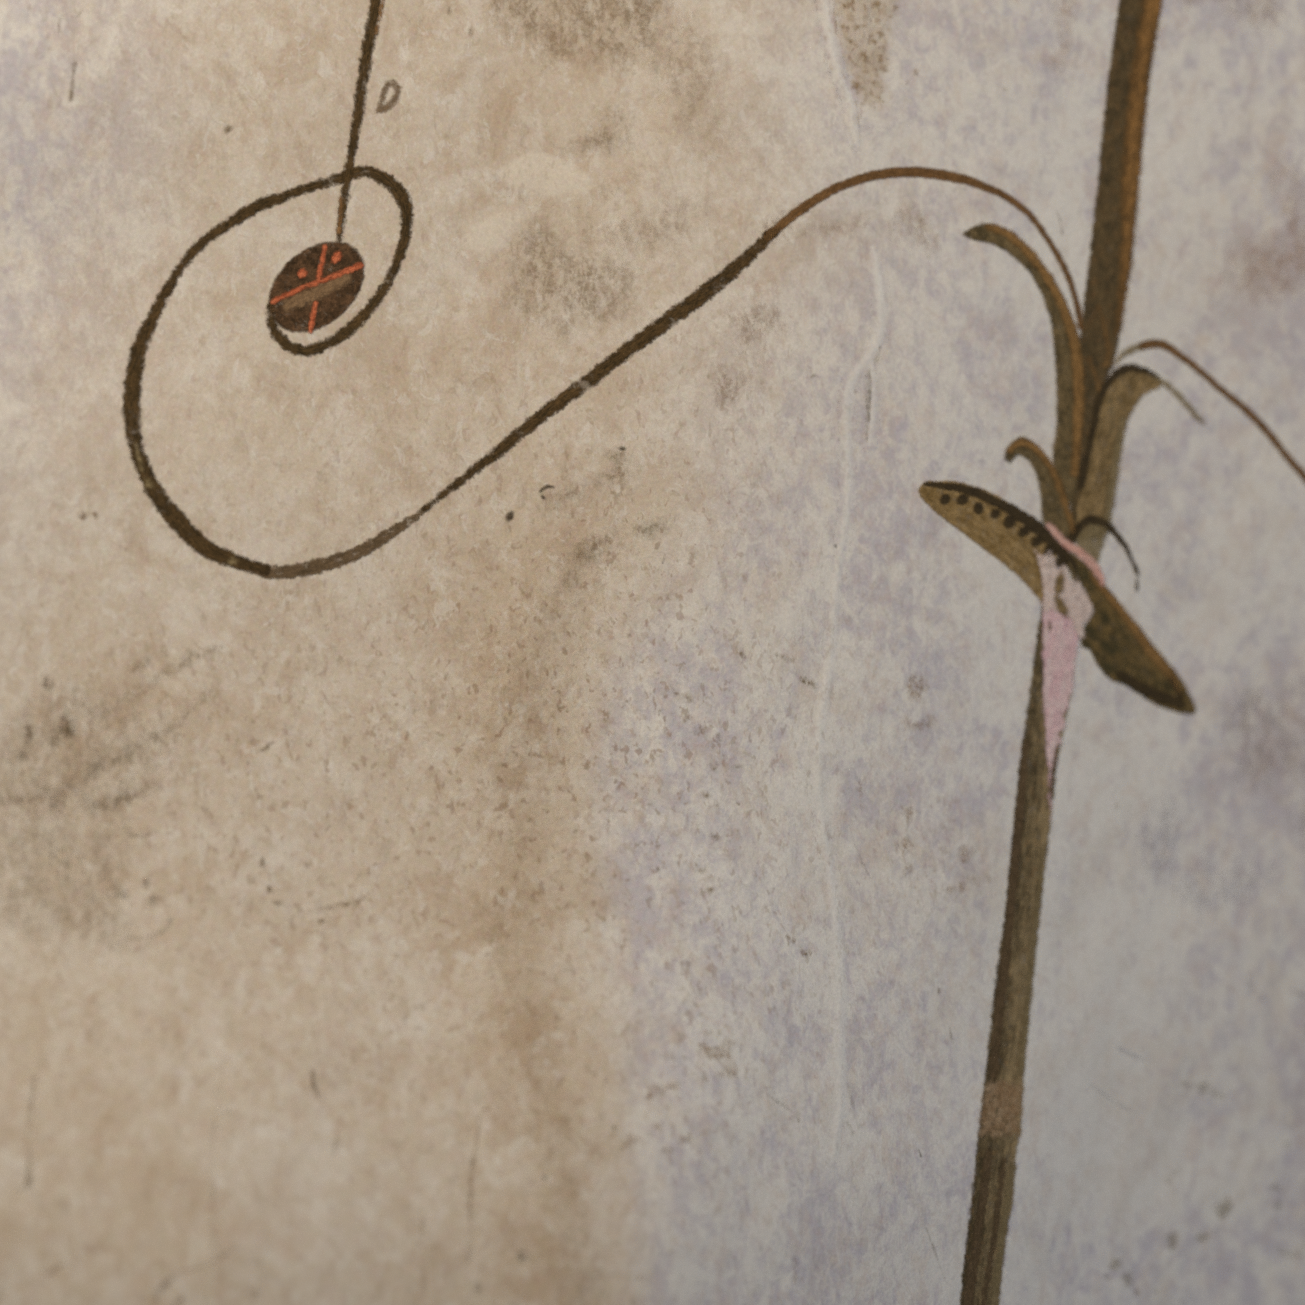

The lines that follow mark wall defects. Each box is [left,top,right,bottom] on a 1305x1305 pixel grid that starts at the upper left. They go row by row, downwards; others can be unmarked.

peeling [811,0,923,128]